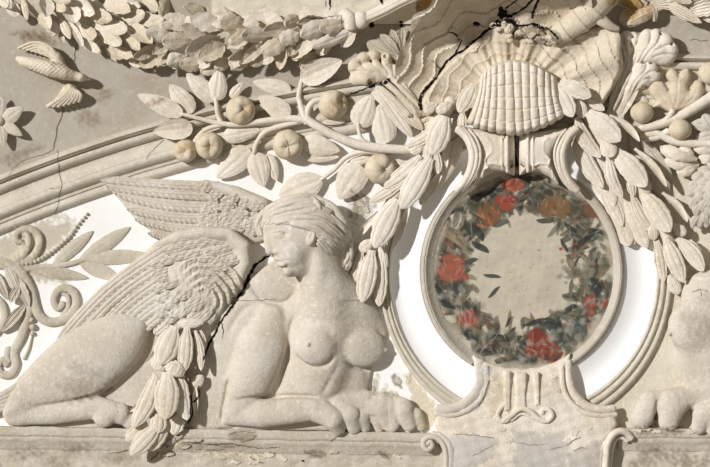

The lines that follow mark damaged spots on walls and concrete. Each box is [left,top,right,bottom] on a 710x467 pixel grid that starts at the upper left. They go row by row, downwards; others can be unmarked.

crack [418,0,559,110]
crack [10,108,63,213]
crack [203,255,272,360]